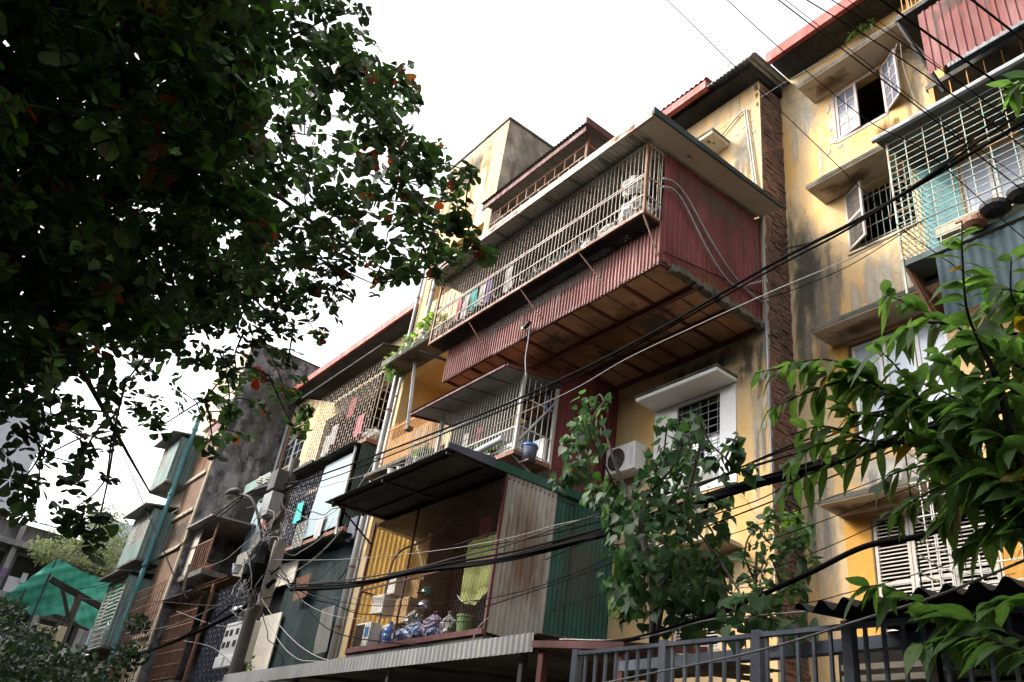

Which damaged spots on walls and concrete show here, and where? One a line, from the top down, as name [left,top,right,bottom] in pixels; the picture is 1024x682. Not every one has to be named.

water stain [817,43,862,93]
water stain [794,228,912,373]
water stain [672,347,766,474]
water stain [204,460,257,523]